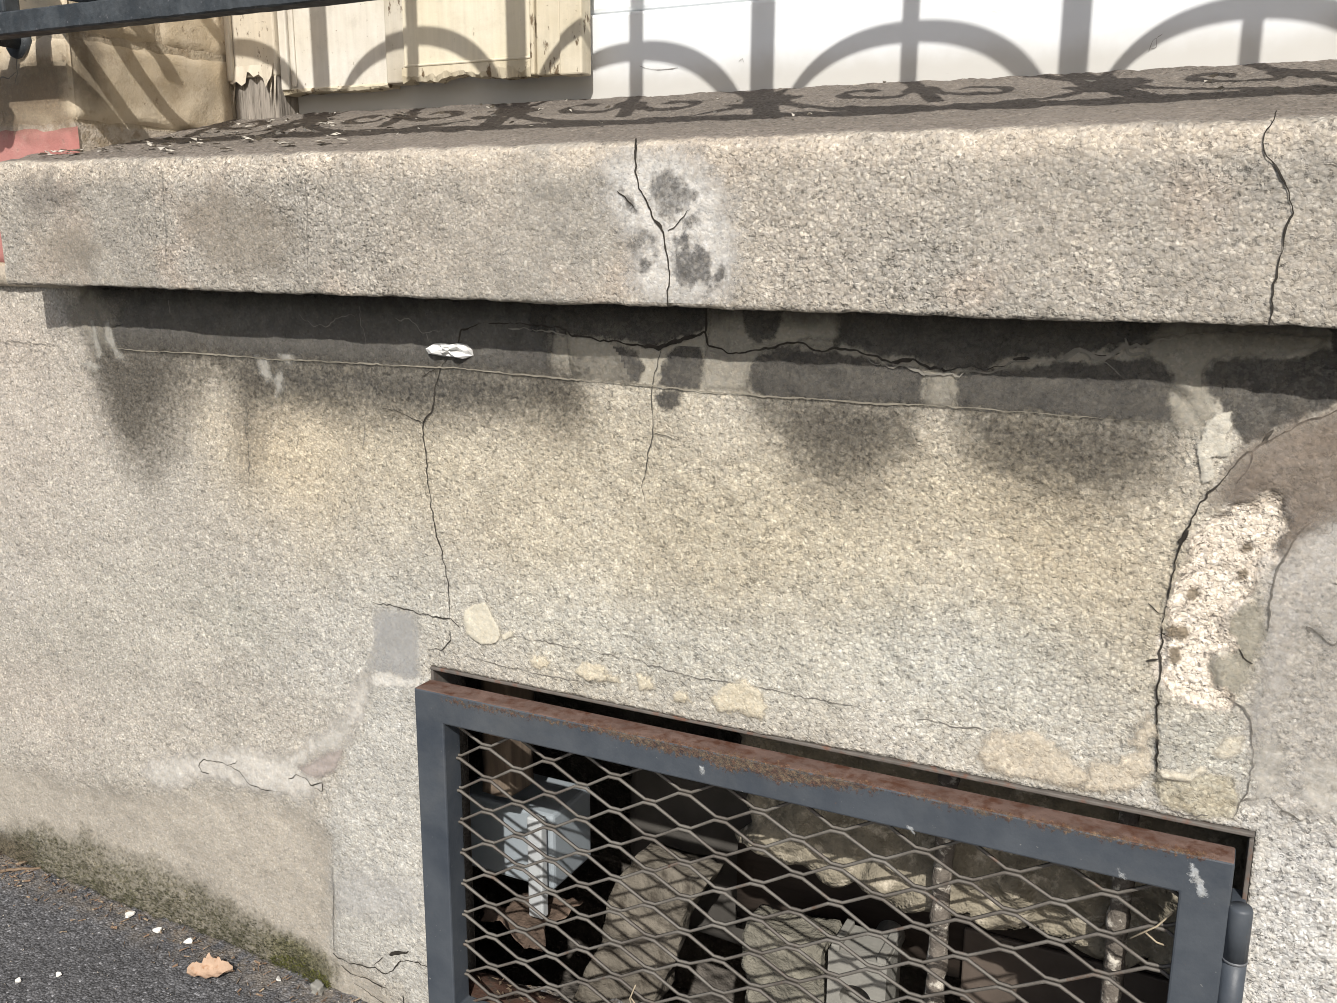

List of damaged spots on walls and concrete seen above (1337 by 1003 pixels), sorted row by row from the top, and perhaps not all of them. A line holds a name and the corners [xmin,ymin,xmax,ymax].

crack [617,138,690,307]
crack [1262,110,1294,327]
water stain [69,288,263,458]
water stain [655,390,680,411]
crack [362,308,1030,730]
water stain [702,308,842,390]
water stain [788,408,896,473]
water stain [986,418,1145,481]
peeling [1196,412,1233,483]
spalling [1161,491,1290,710]
crack [1146,410,1337,772]
crack [1169,702,1301,821]